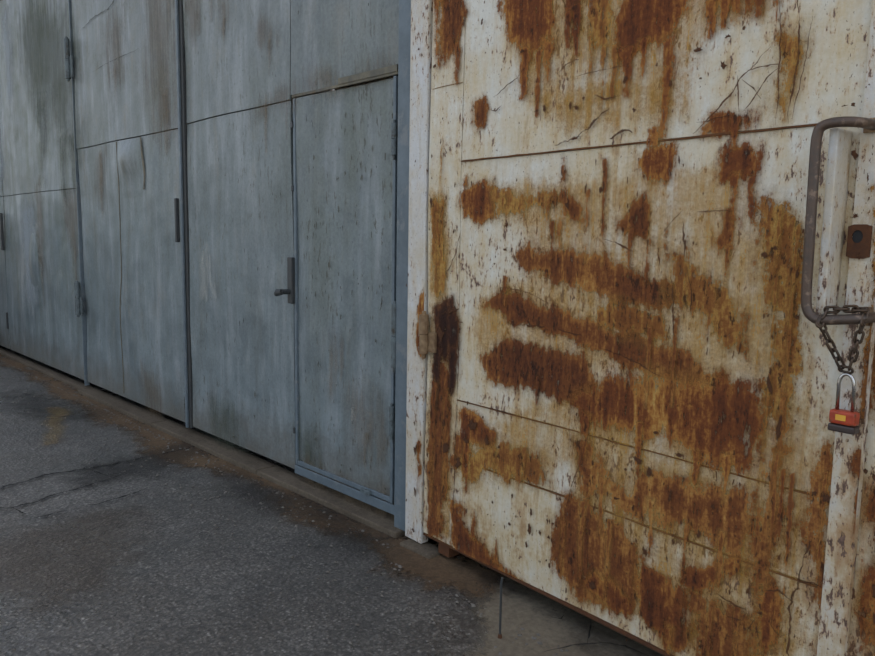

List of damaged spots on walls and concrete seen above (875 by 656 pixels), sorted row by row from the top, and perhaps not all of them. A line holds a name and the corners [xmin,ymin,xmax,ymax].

corrosion [415,0,833,656]
corrosion [859,326,875,419]
corrosion [850,448,875,552]
corrosion [854,559,875,656]